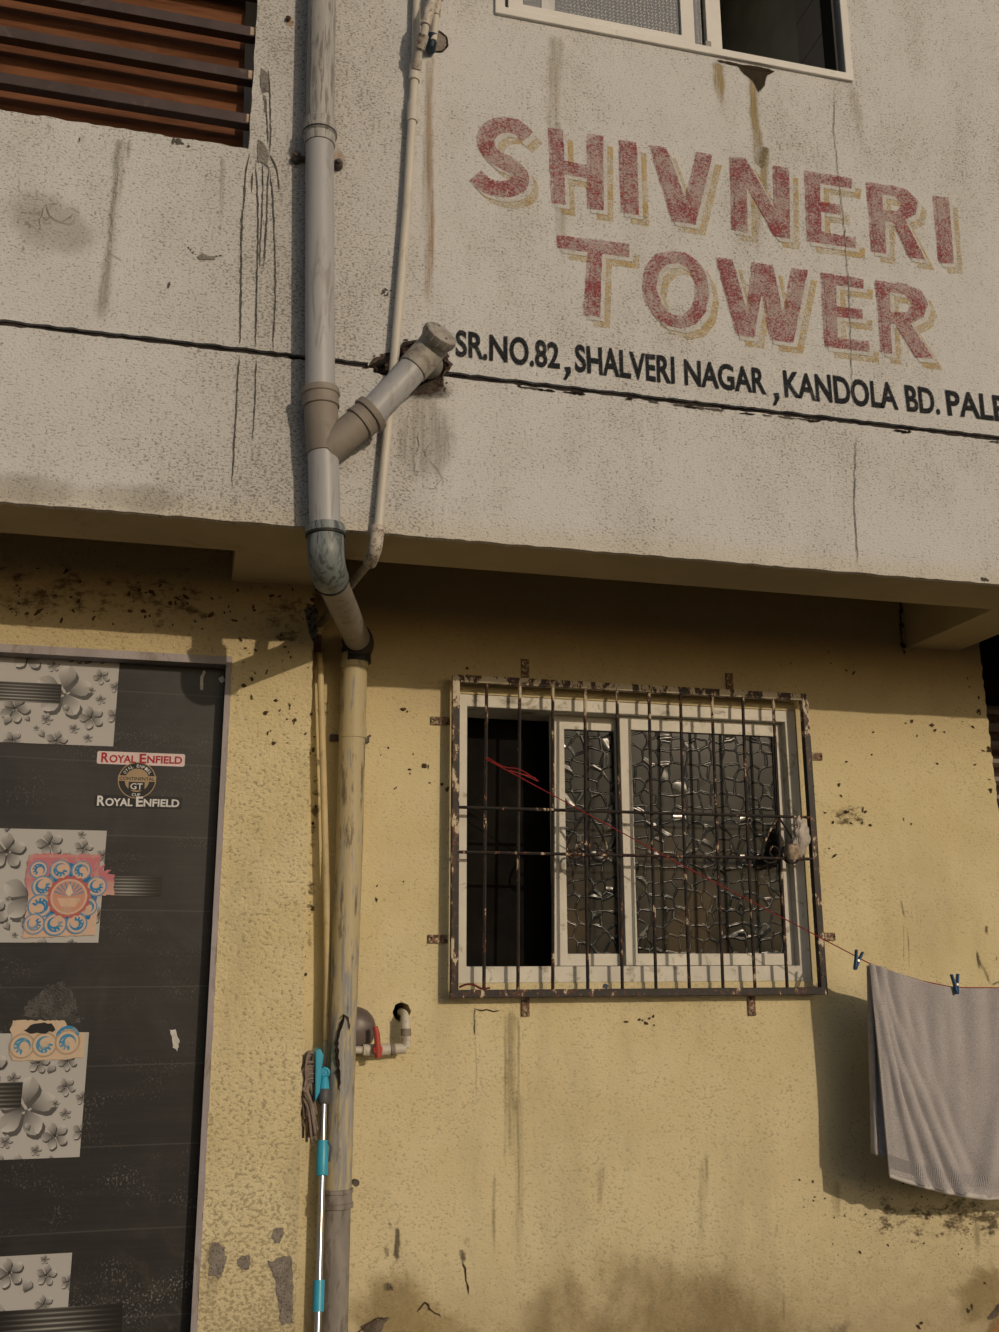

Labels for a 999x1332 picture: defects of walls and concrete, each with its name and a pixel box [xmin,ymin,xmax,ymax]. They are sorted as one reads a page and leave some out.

leakage [239,71,280,353]
leakage [232,359,257,486]
leakage [8,568,111,623]
leakage [125,580,317,700]
leakage [263,698,327,845]
spalling [208,1242,250,1280]
spalling [268,1228,294,1325]
leakage [864,1172,999,1255]
leakage [964,1273,999,1332]